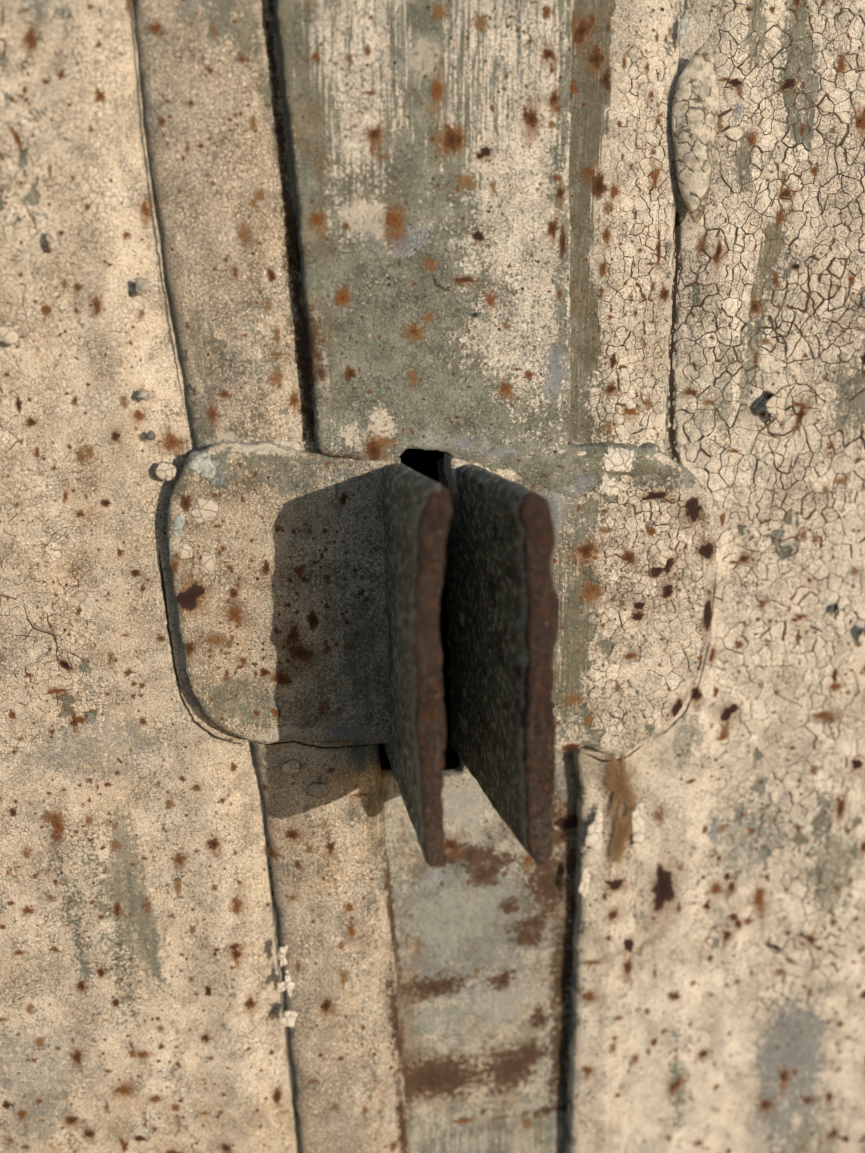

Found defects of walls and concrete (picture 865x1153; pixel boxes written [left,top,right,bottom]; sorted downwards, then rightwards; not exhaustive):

corrosion [159,88,217,161]
crack [0,2,114,776]
corrosion [106,653,145,711]
corrosion [561,494,712,652]
crack [568,0,865,1038]
corrosion [310,791,601,1153]
corrosion [610,801,865,1113]